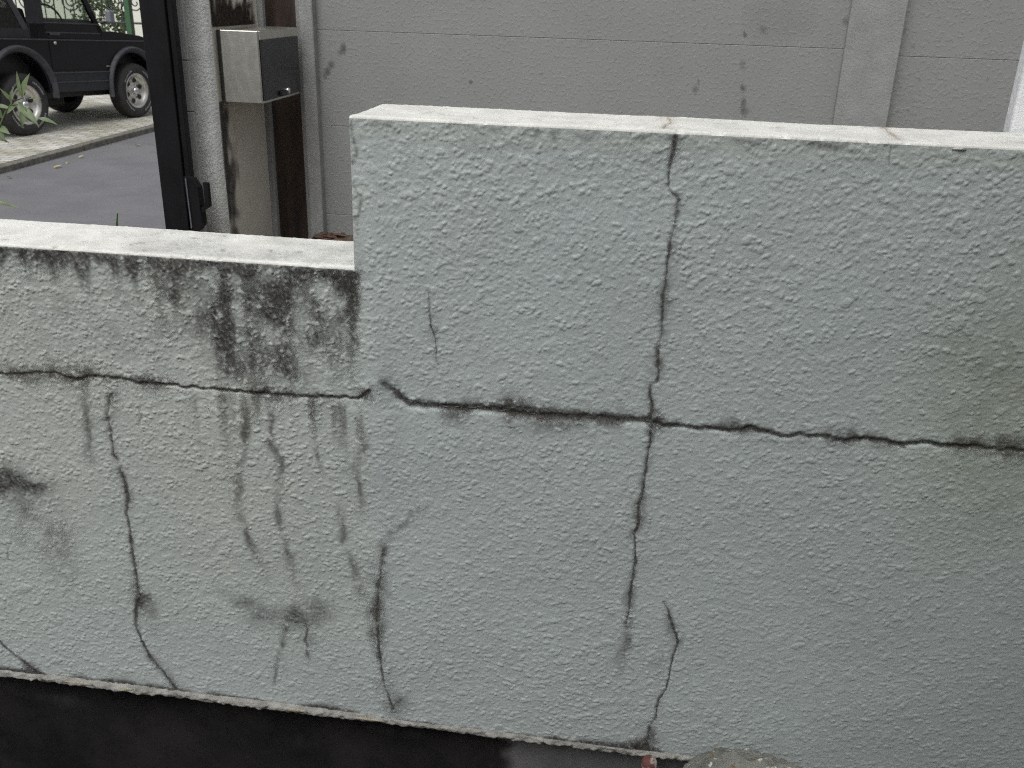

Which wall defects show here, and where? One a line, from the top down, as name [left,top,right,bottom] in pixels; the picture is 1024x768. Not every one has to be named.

crack [219,101,237,234]
crack [660,134,679,318]
damp [0,247,358,378]
damp [240,407,249,442]
crack [0,349,1024,690]
crack [634,607,679,750]